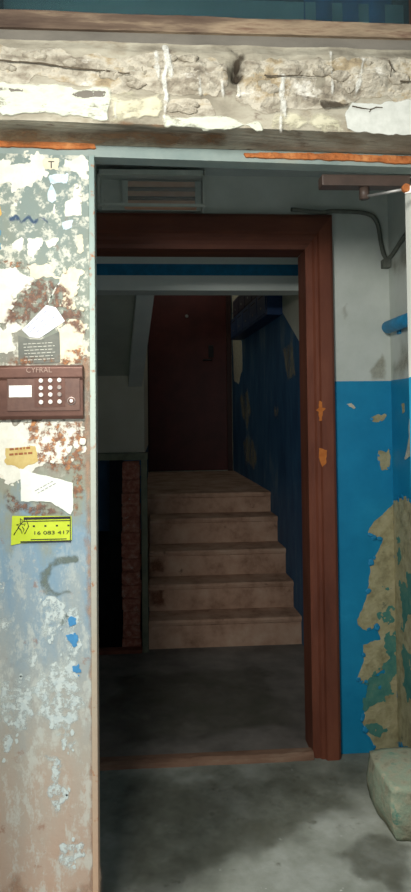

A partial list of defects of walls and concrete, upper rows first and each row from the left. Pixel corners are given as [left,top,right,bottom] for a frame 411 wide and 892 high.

crack [0,59,130,74]
water stain [155,45,172,110]
spalling [0,44,411,135]
rust [0,141,96,150]
rust [244,152,411,164]
rust [5,279,85,333]
rust [44,346,90,391]
rust [26,405,91,522]
rust [7,493,62,516]
flaking render [356,494,411,749]
peeling [1,596,85,811]
peeling [59,837,85,869]